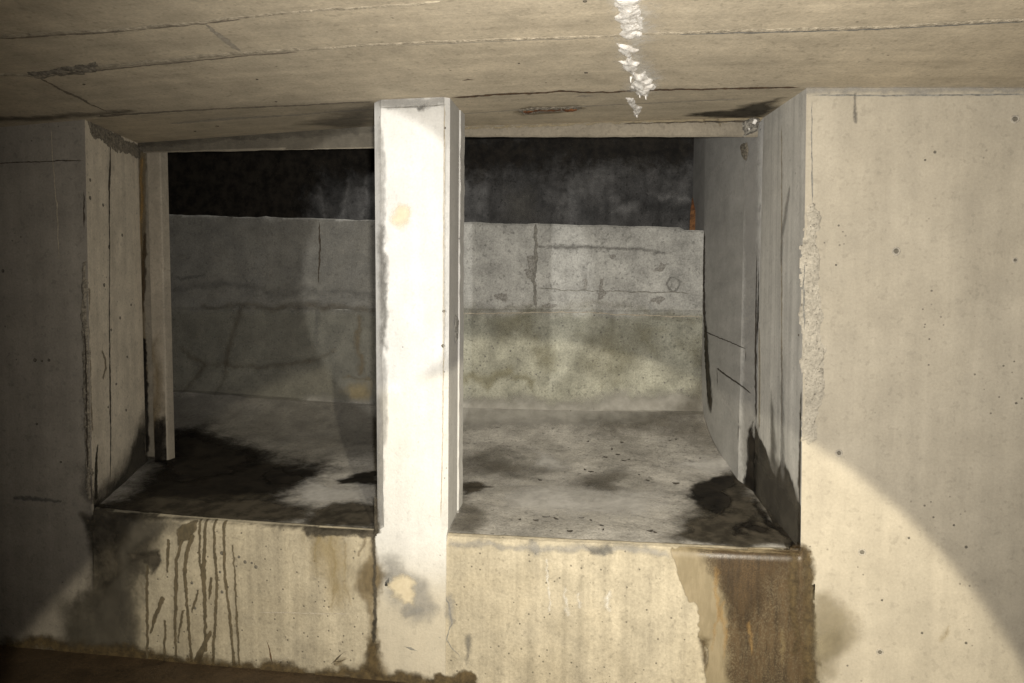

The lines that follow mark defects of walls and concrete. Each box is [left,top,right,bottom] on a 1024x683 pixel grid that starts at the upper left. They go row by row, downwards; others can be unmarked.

water stain [614,0,658,117]
water stain [690,101,776,138]
water stain [0,420,477,683]
water stain [511,475,647,512]
water stain [670,255,849,683]